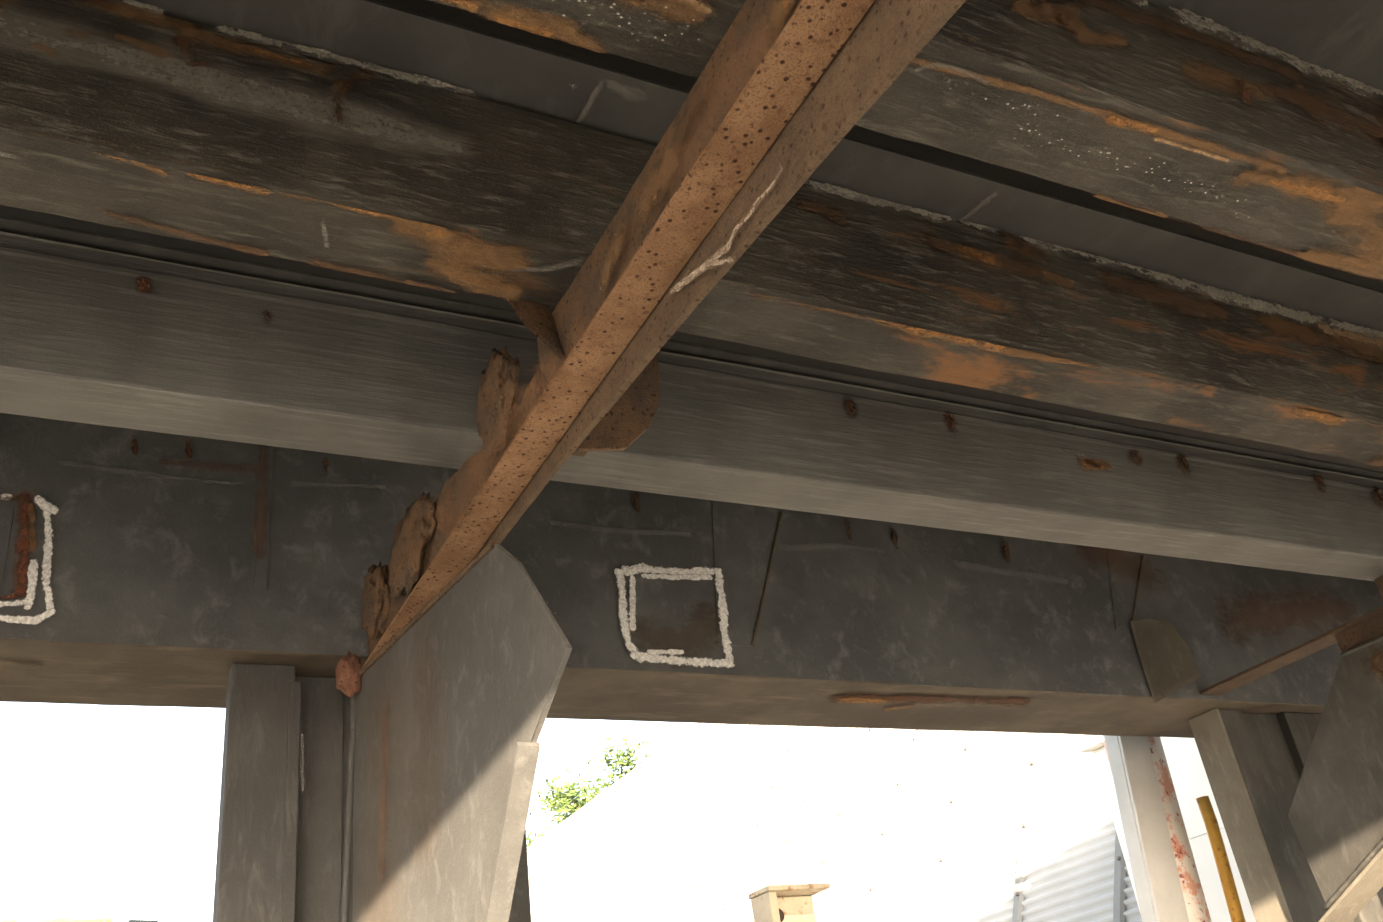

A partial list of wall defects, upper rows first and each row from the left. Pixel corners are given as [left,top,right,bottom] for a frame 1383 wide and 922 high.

peeling [1134,0,1383,97]
peeling [806,180,1383,339]
rust [1266,401,1383,428]
rust [0,492,37,599]
rust [830,694,1030,711]